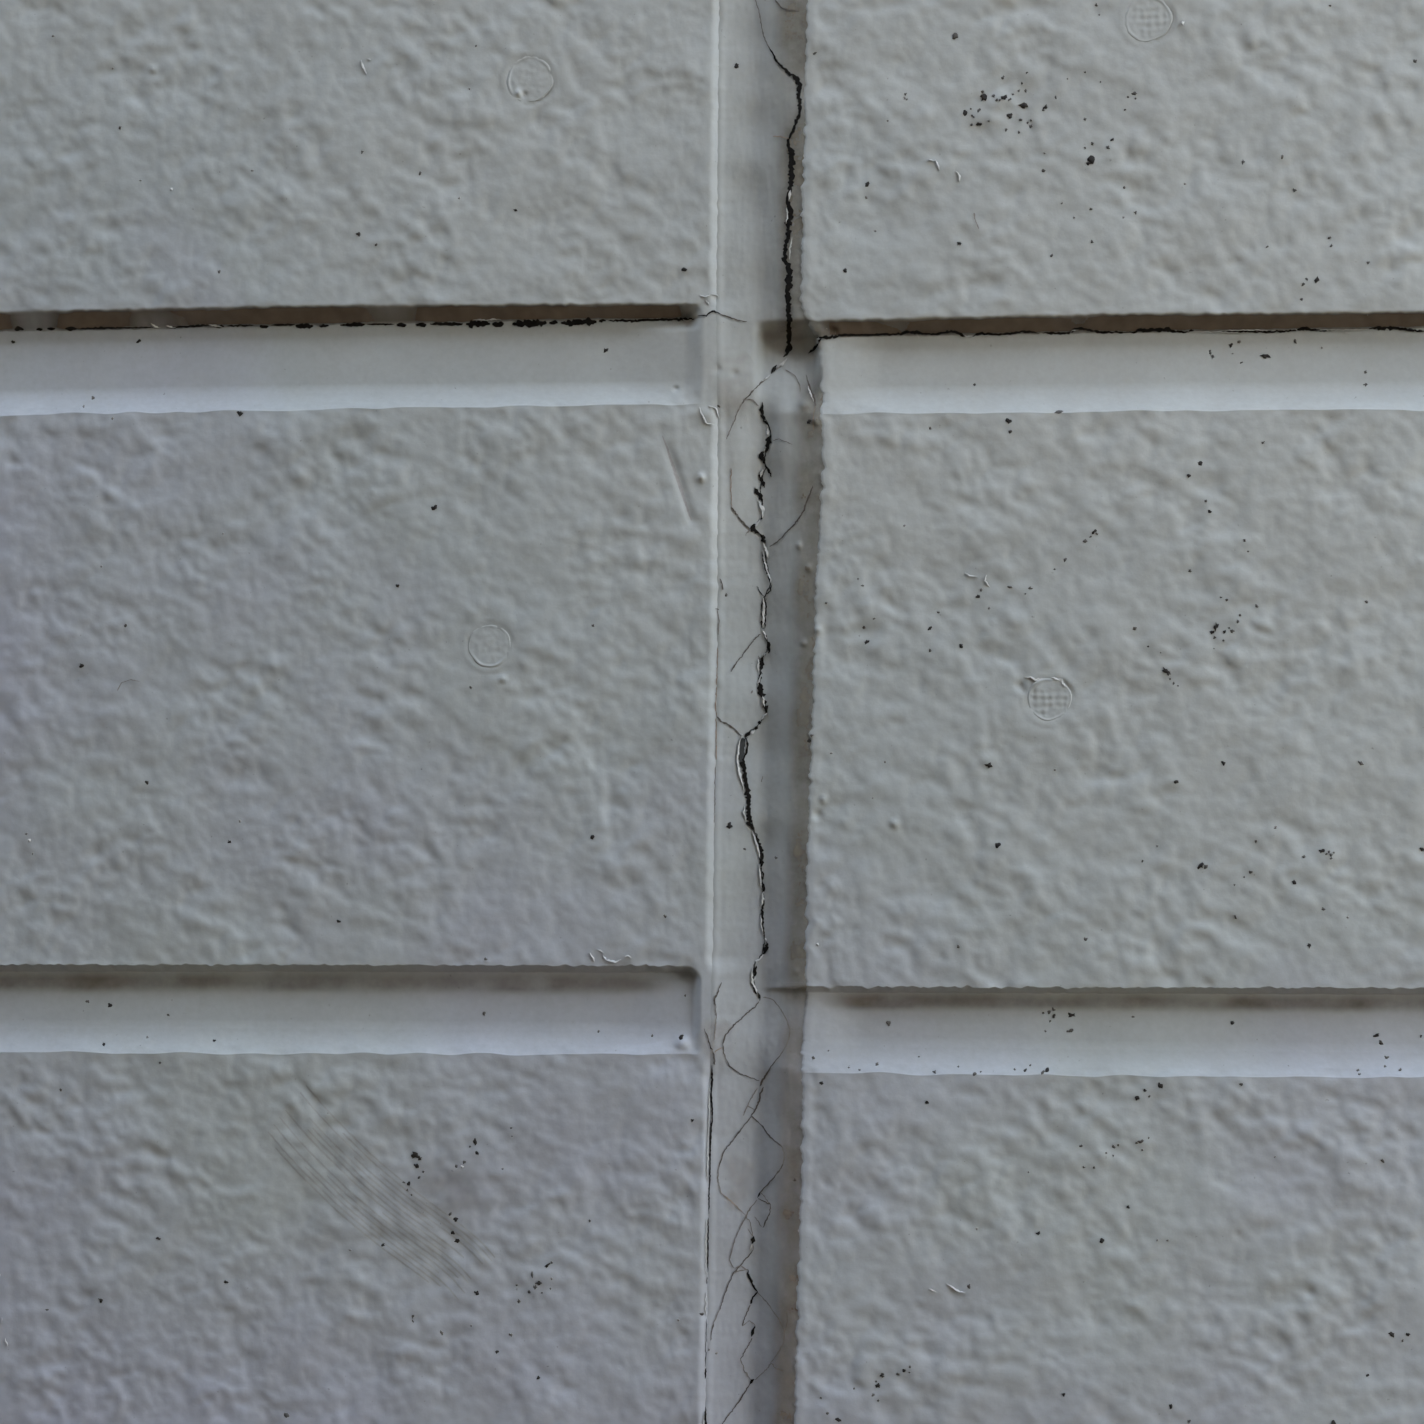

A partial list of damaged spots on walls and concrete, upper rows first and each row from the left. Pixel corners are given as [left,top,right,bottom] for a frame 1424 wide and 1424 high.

crack [703,0,1424,1424]